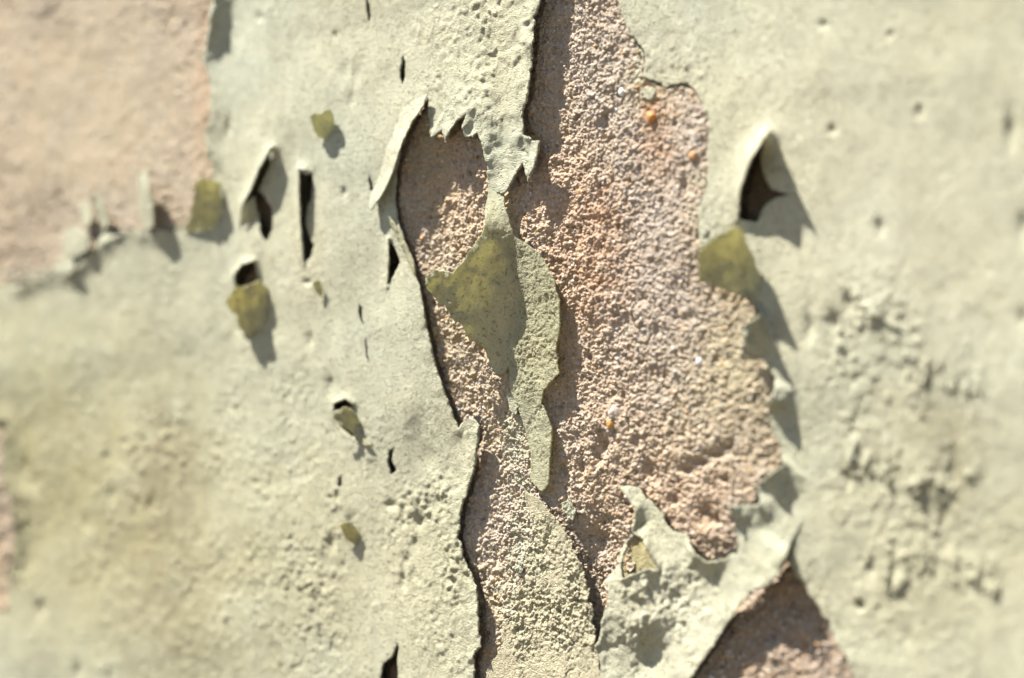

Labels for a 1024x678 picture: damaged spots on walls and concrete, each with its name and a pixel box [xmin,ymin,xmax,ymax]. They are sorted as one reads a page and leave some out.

peeling [0,0,223,286]
peeling [309,109,336,140]
peeling [241,191,273,239]
peeling [226,262,270,338]
peeling [369,0,788,678]
peeling [333,400,371,446]
peeling [692,558,853,678]